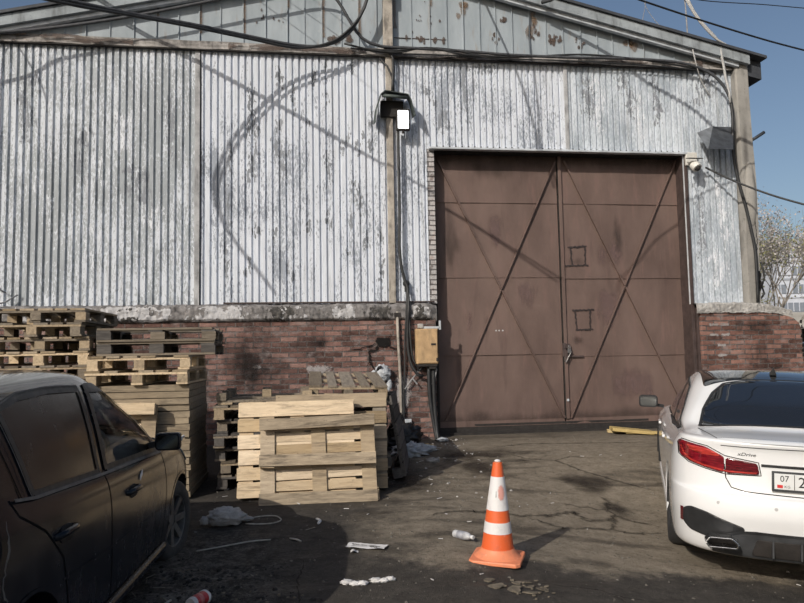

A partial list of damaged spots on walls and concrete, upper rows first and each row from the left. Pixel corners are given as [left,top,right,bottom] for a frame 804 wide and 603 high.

peeling [5,46,72,143]
peeling [71,124,110,188]
peeling [109,108,136,154]
peeling [242,77,291,183]
peeling [271,66,297,116]
peeling [614,70,667,142]
peeling [119,163,165,231]
peeling [692,161,734,290]
peeling [90,306,171,324]
peeling [185,237,310,322]
peeling [331,304,393,321]
spalling [410,304,432,320]